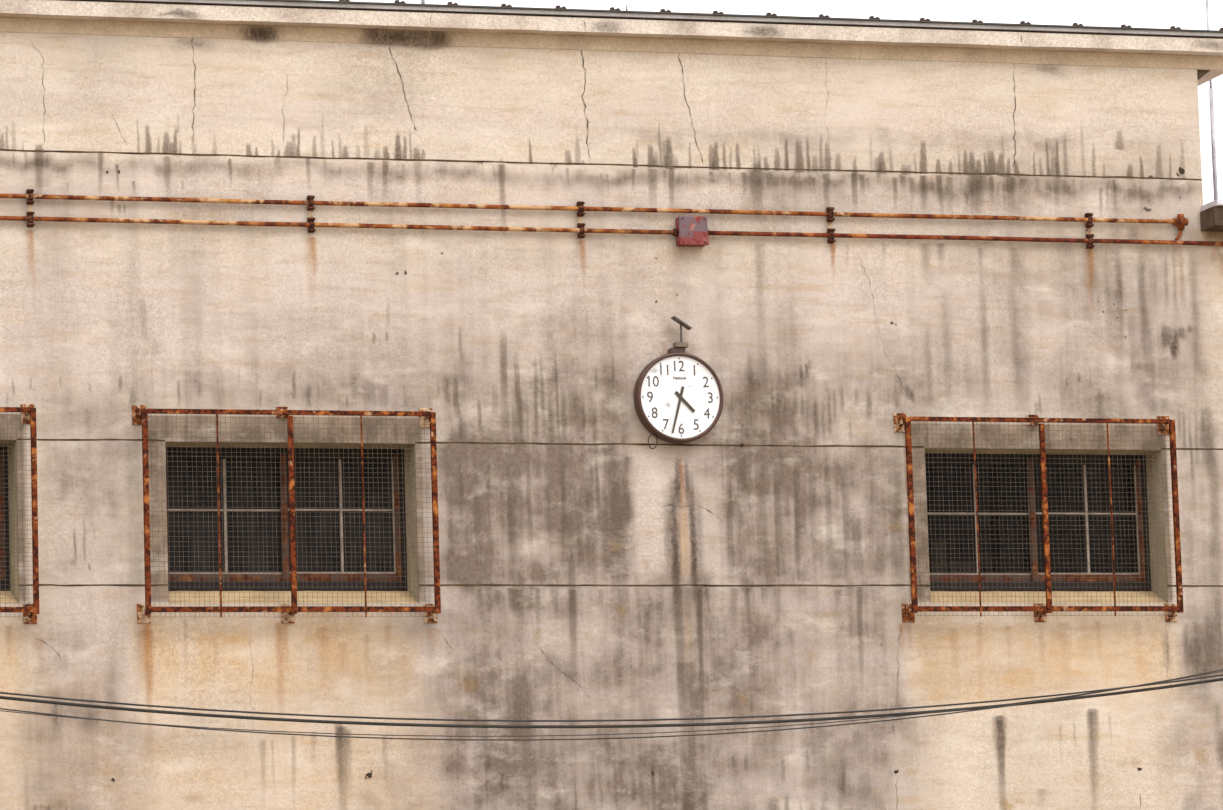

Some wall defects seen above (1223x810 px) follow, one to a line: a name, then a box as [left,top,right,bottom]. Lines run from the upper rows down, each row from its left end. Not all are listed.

crack [389,48,416,130]
crack [581,22,589,154]
water stain [634,147,673,175]
water stain [710,148,810,176]
water stain [964,158,1019,182]
crack [1011,86,1019,164]
water stain [672,471,696,610]